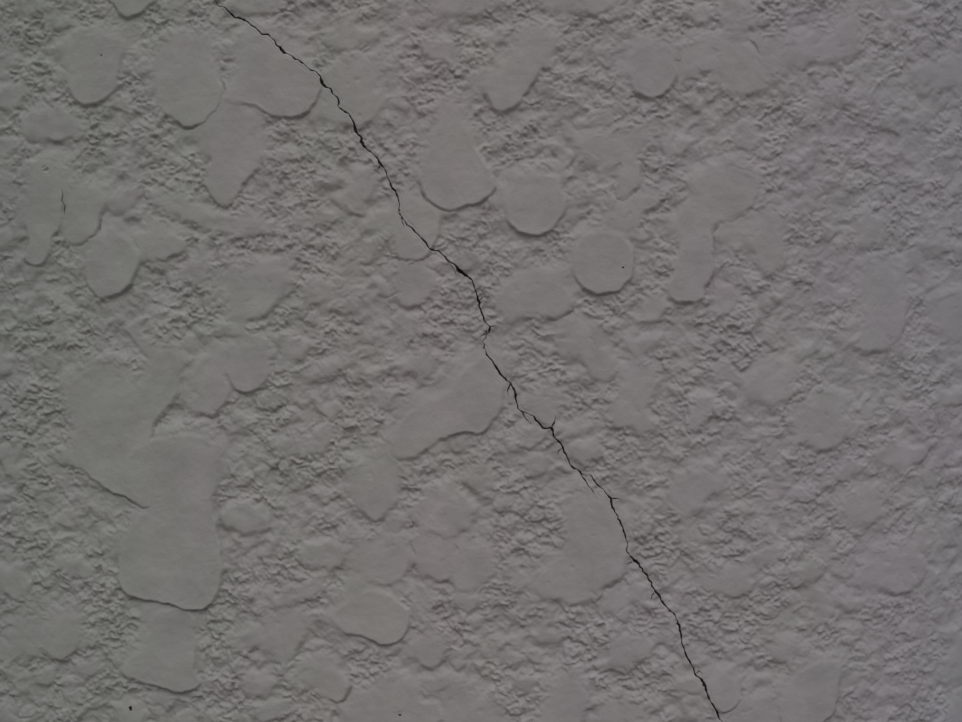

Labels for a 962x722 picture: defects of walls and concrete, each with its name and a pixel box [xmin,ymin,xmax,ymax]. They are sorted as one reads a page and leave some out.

crack [209,0,725,722]